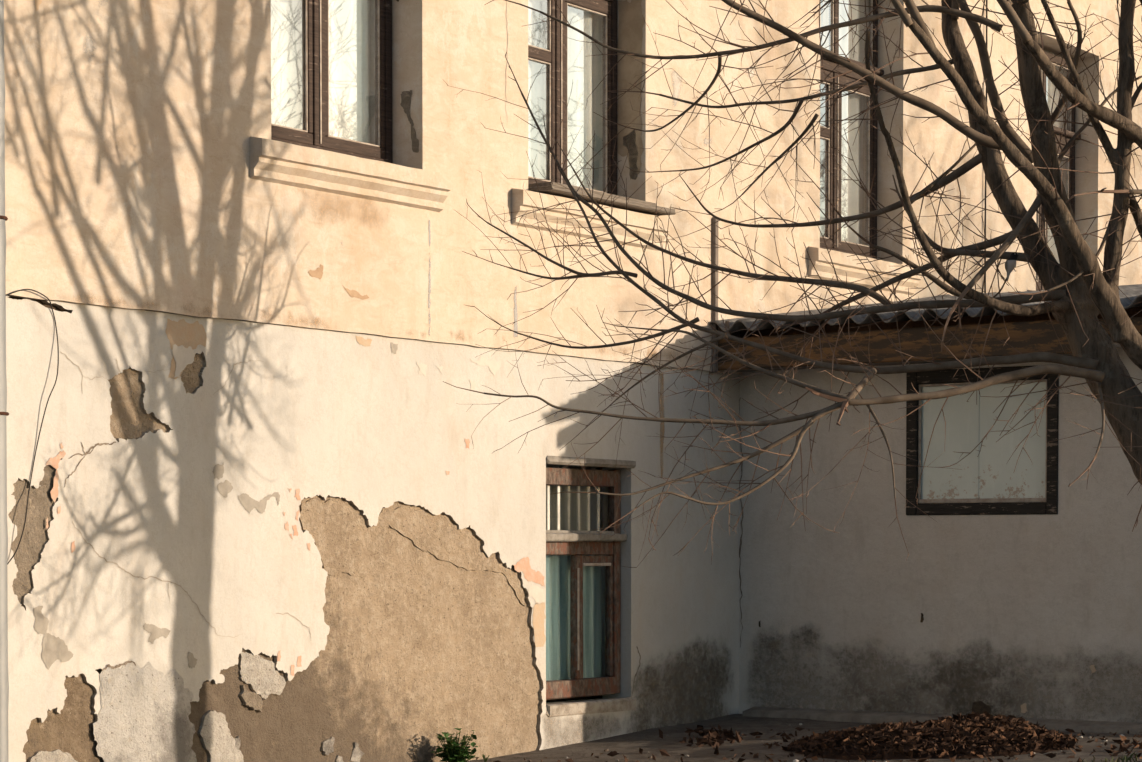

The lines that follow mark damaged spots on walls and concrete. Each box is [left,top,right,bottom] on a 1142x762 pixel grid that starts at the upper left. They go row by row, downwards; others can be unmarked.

flaking render [400,90,419,153]
peeling [165,319,207,394]
flaking render [108,366,173,442]
crack [65,441,116,484]
flaking render [8,443,104,762]
crack [72,521,241,638]
flaking render [187,462,546,762]
damp [752,630,1142,723]